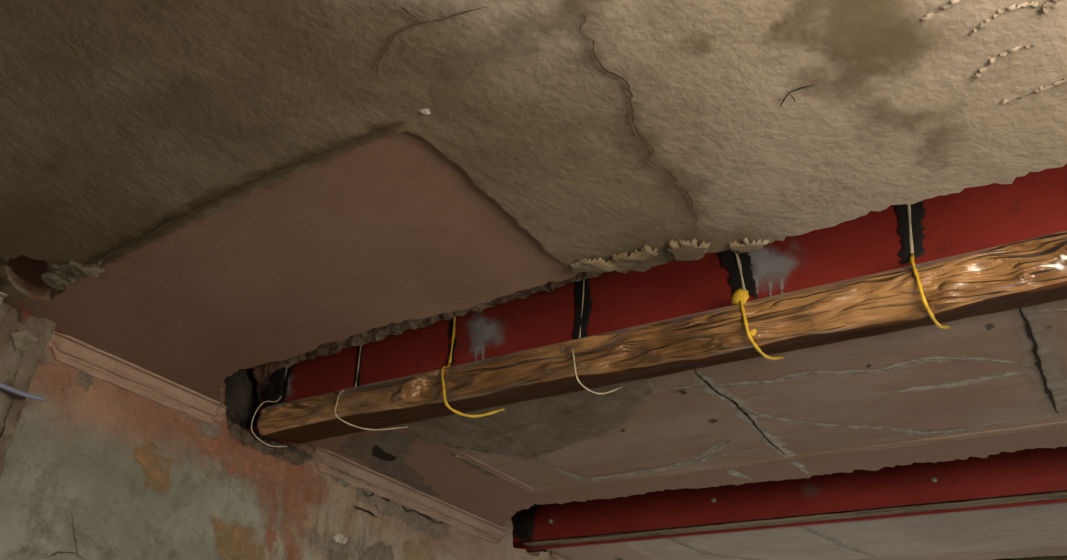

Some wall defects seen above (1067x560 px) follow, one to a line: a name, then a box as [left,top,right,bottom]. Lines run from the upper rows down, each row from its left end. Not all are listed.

crack [376,7,486,74]
crack [579,13,705,235]
spalling [40,262,104,291]
crack [536,308,1067,481]
spalling [201,419,313,465]
spalling [342,432,438,495]
spalling [315,533,394,560]